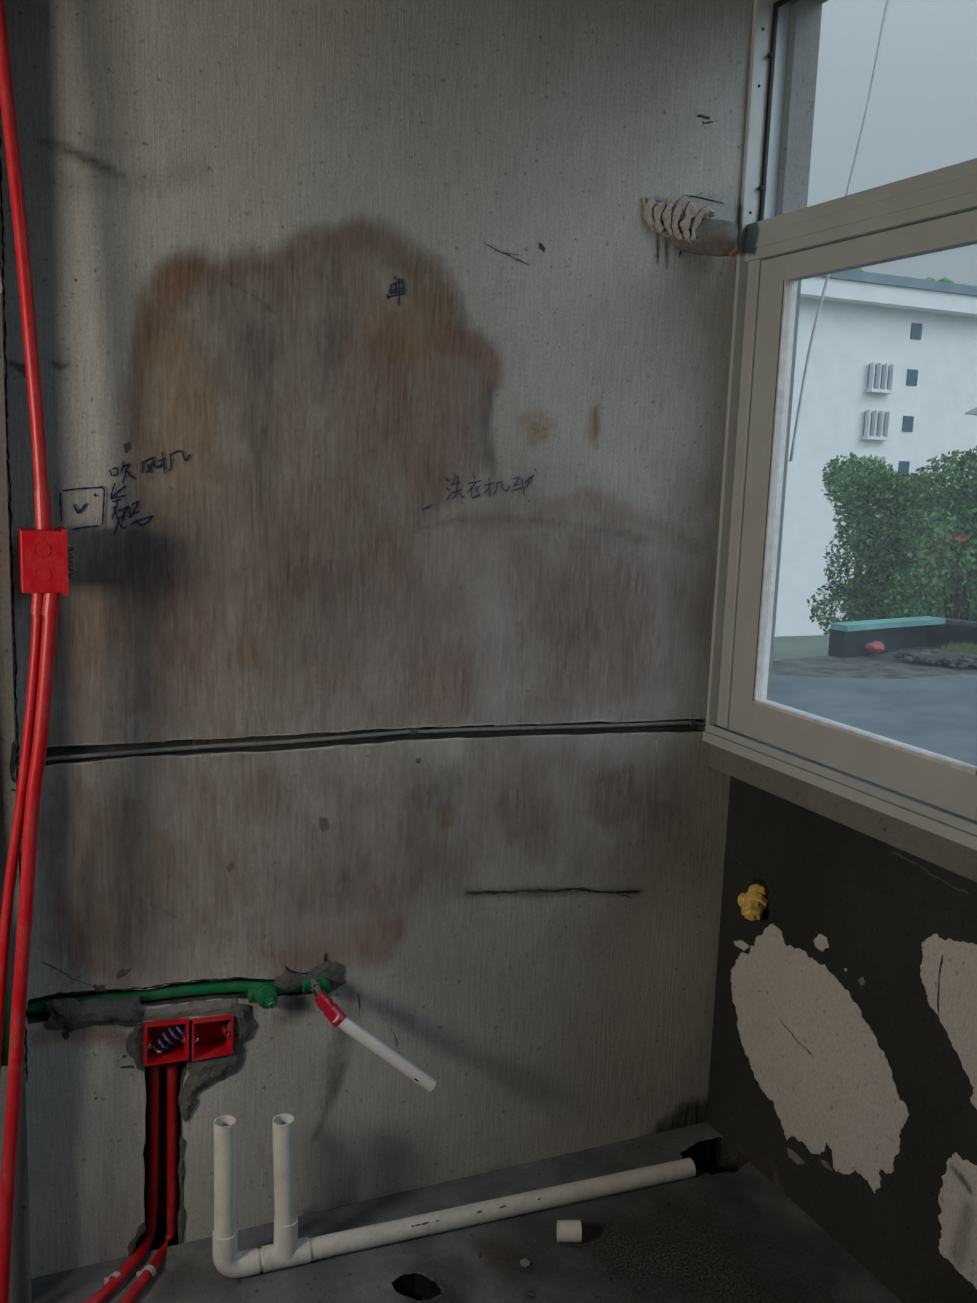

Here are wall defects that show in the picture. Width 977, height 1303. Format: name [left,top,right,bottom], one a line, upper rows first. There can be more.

damp [69,223,509,719]
crack [465,887,641,898]
peeling [731,923,910,1193]
peeling [920,934,977,1109]
peeling [938,1152,977,1289]